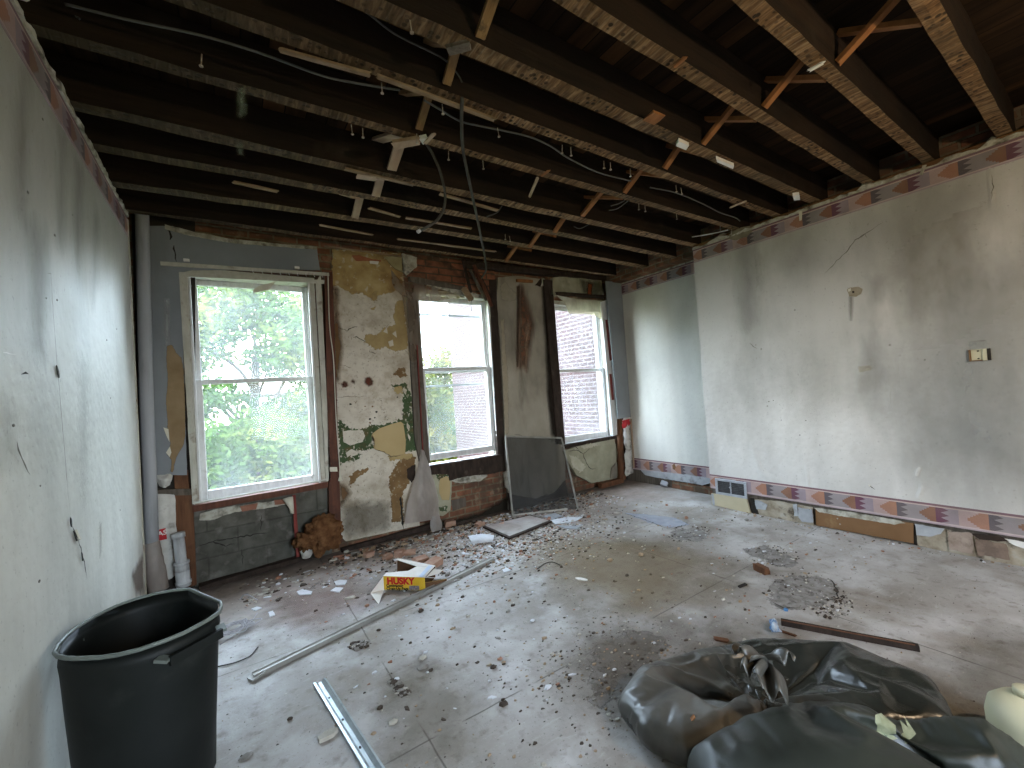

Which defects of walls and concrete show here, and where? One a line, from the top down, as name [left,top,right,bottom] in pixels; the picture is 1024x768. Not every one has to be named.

spalling [149,215,195,232]
peeling [331,249,408,352]
spalling [131,213,143,503]
peeling [157,277,195,489]
peeling [338,367,416,523]
flaking render [425,471,511,528]
spalling [814,508,904,525]